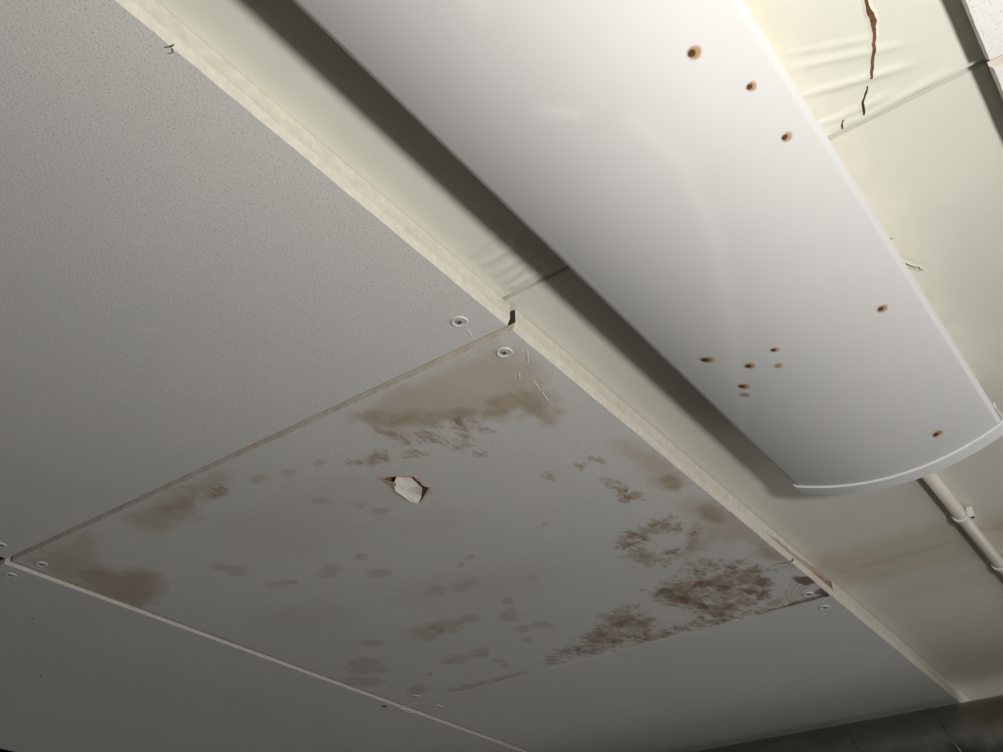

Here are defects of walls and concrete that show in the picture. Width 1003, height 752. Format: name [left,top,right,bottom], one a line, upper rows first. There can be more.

crack [841,0,880,129]
crack [890,238,926,272]